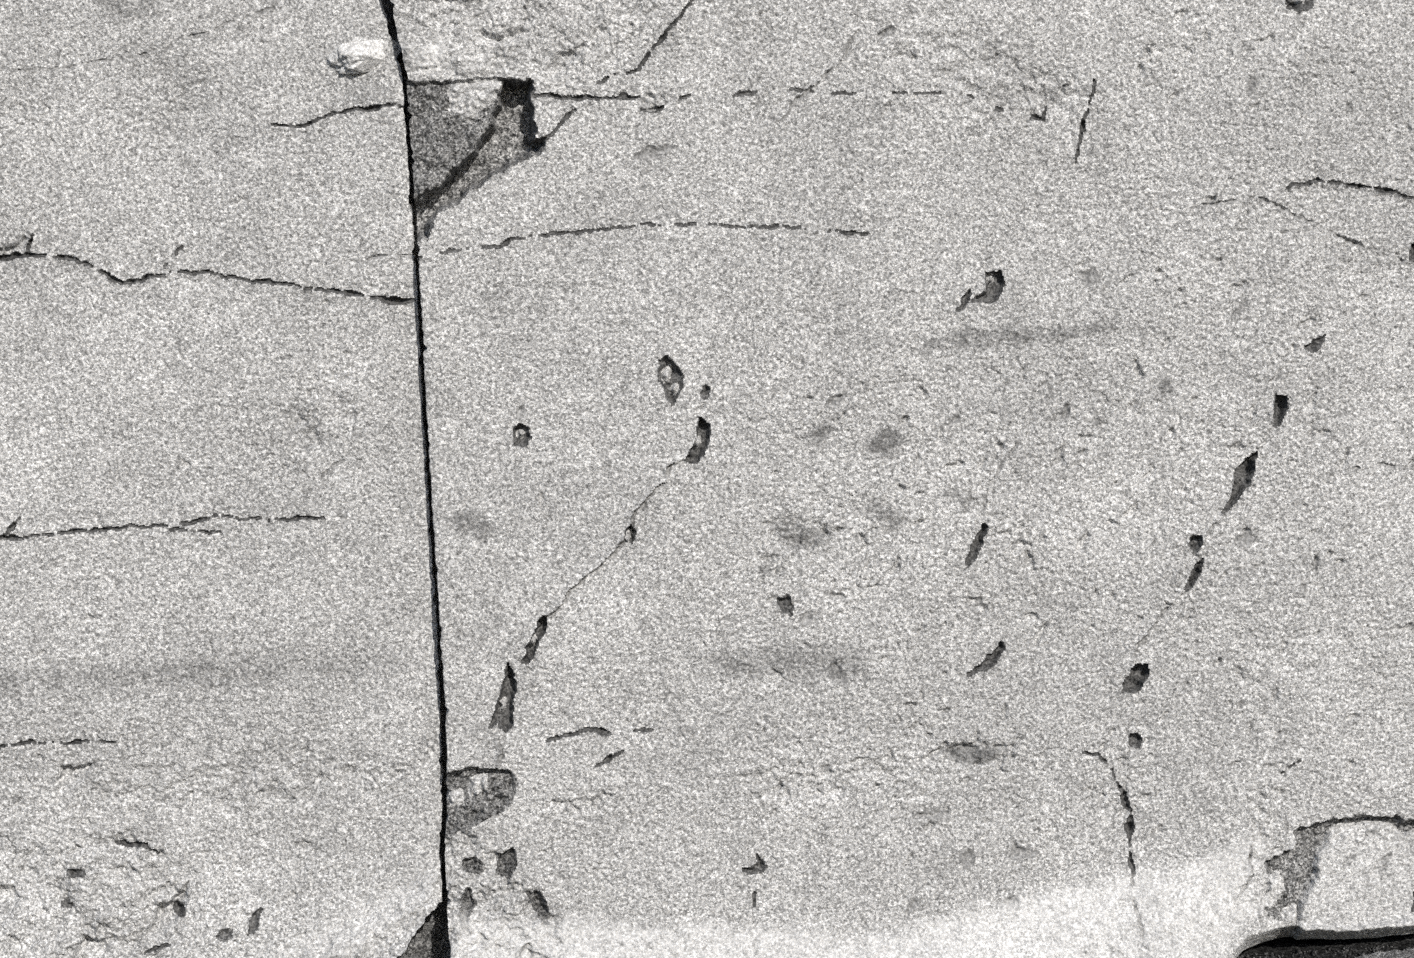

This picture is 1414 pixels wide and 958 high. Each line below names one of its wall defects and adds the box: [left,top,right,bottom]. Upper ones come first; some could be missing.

spalling [391,0,677,242]
crack [531,0,694,149]
crack [0,221,870,305]
crack [1192,177,1414,267]
spalling [0,519,20,541]
crack [0,459,344,541]
crack [488,417,711,769]
crack [1121,393,1289,693]
spalling [0,736,419,958]
spalling [290,765,616,958]
crack [1081,750,1147,949]
spalling [1233,743,1414,940]